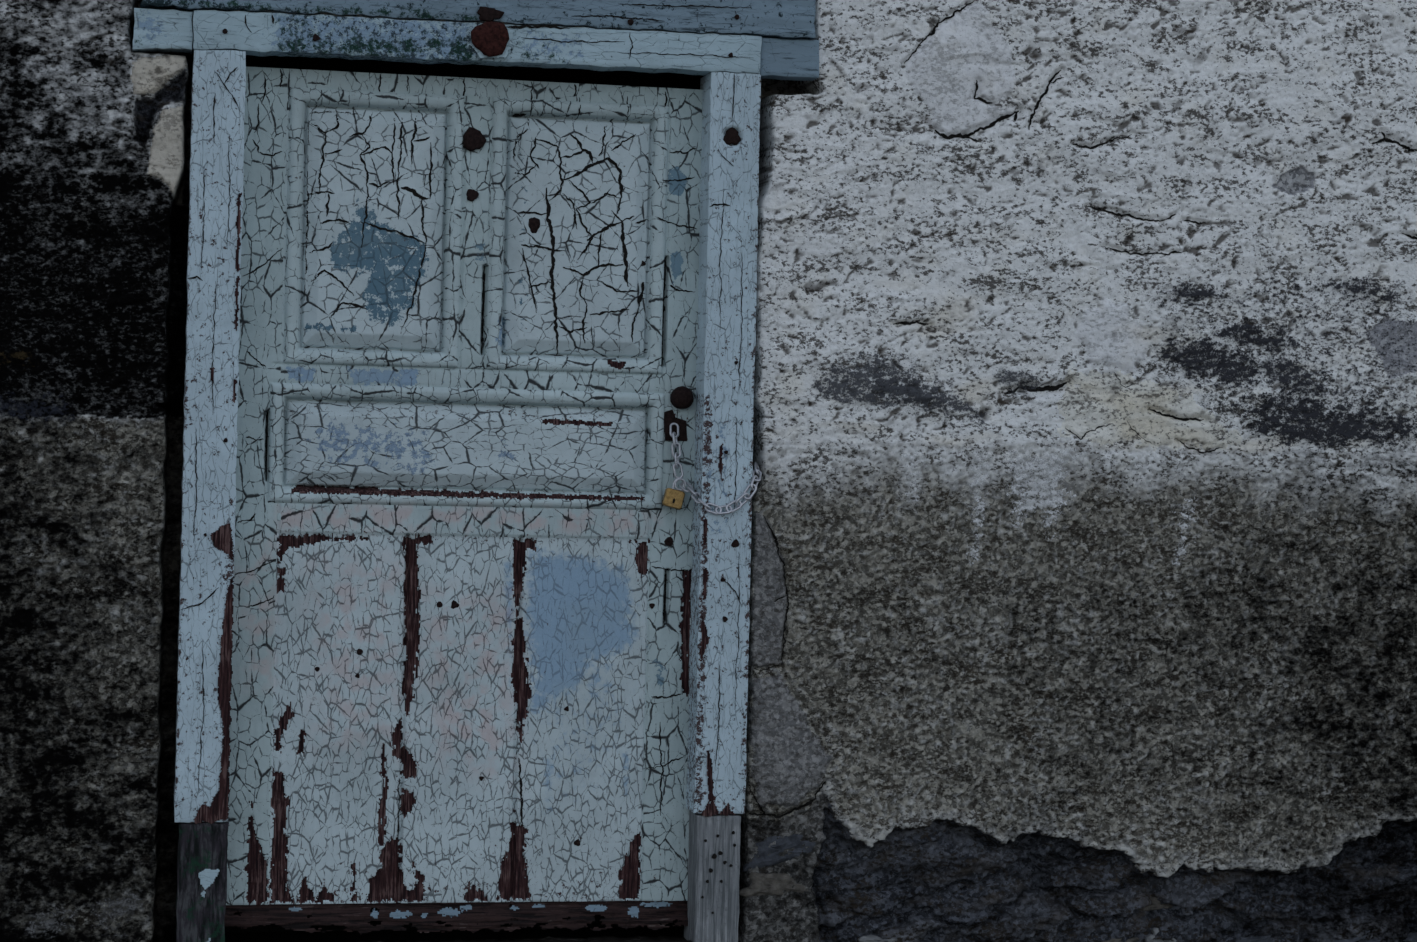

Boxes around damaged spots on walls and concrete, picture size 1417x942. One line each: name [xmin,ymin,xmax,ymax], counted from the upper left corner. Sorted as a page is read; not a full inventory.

crack [904,0,975,64]
crack [935,70,1064,142]
crack [1073,134,1132,149]
crack [1372,132,1417,152]
crack [1086,206,1205,256]
crack [893,319,928,327]
crack [1004,382,1067,394]
crack [1067,372,1223,453]
flaking render [701,750,1417,942]
damp [25,893,149,938]